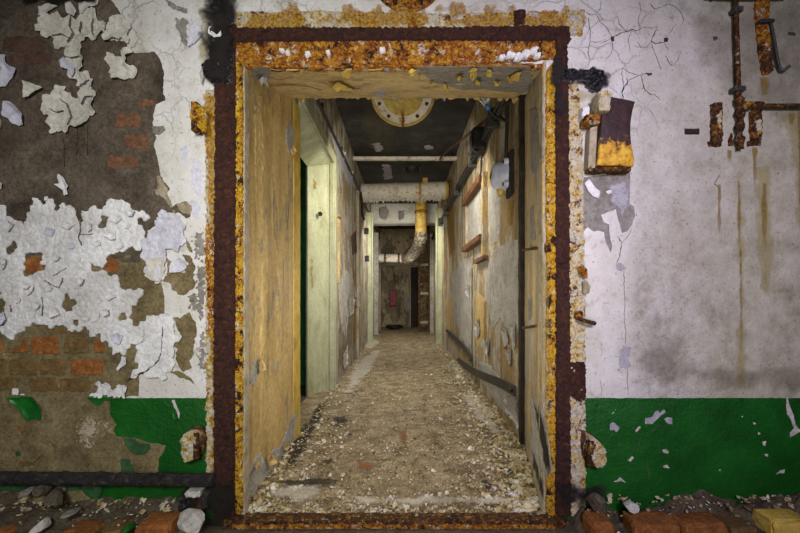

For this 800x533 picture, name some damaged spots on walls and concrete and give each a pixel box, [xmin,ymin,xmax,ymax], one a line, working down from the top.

peeling [165,0,221,46]
crack [588,2,684,98]
rust [753,0,775,93]
flaking render [0,0,204,238]
flaking render [91,232,207,384]
rust [203,95,216,406]
rust [577,265,591,294]
peeling [583,172,635,252]
flaking render [0,293,166,473]
rust [570,361,587,402]
spalling [635,410,672,432]
spalling [786,397,800,437]